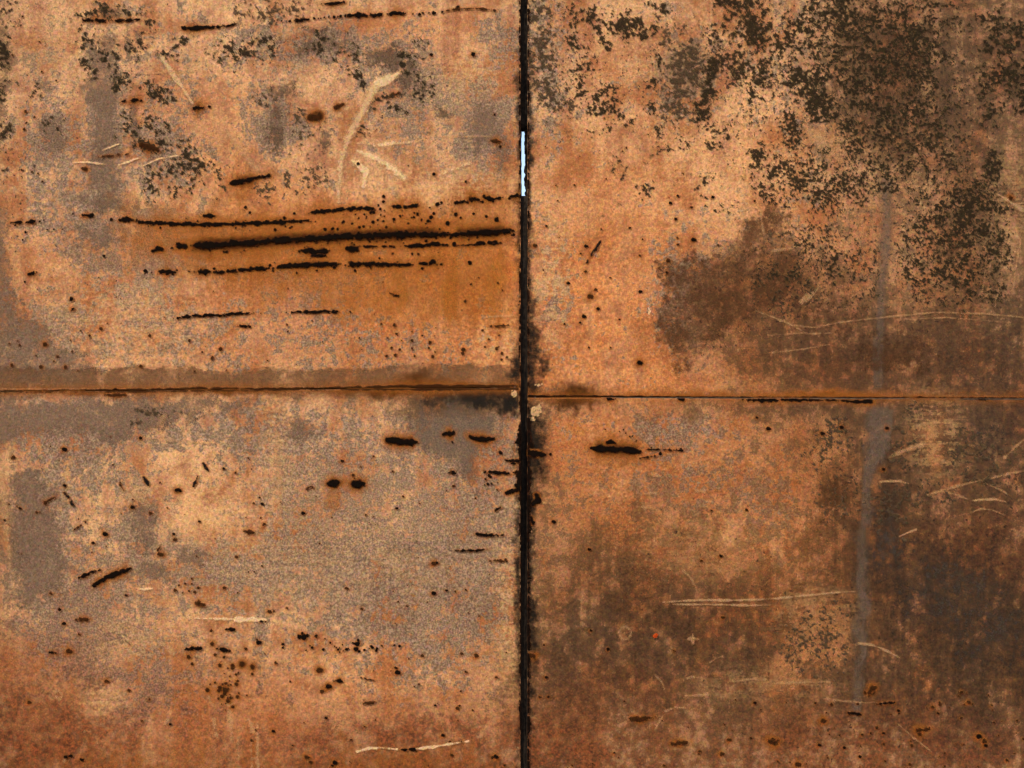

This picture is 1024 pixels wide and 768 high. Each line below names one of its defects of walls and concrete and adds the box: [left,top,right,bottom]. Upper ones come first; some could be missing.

corrosion [110,0,538,387]
leakage [651,204,940,382]
corrosion [0,373,874,768]